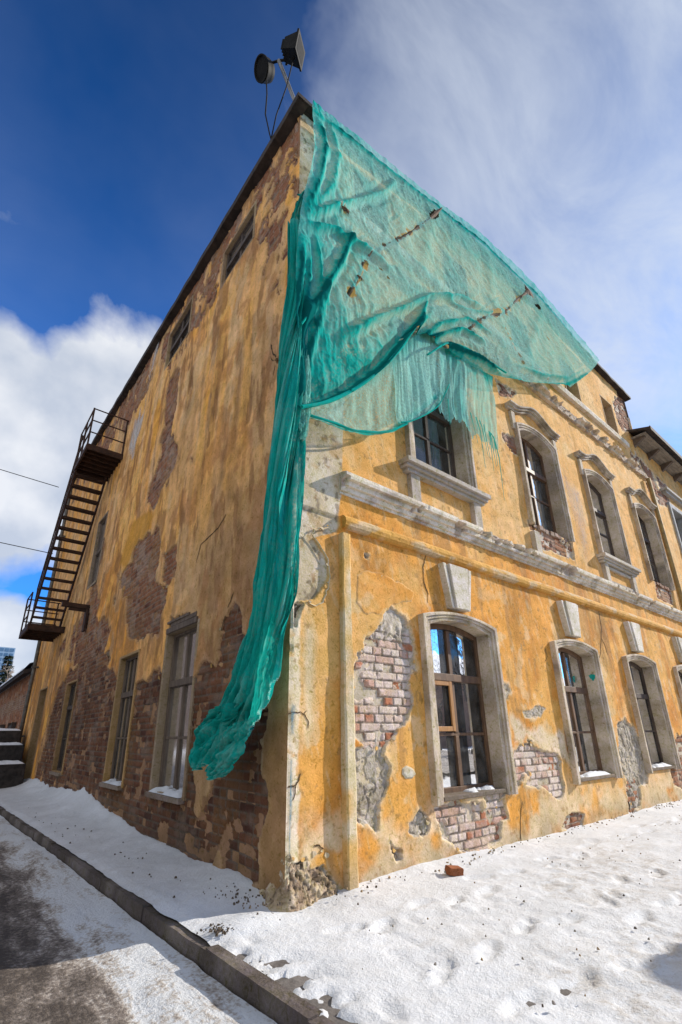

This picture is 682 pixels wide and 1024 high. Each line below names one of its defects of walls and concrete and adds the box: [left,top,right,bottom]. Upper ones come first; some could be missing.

flaking render [254,122,300,263]
flaking render [98,211,243,509]
flaking render [613,394,630,431]
flaking render [528,523,572,557]
flaking render [35,525,338,912]
flaking render [354,608,416,831]
peeling [523,706,544,718]
flaking render [513,741,562,798]
flaking render [617,719,649,812]
flaking render [408,793,507,852]